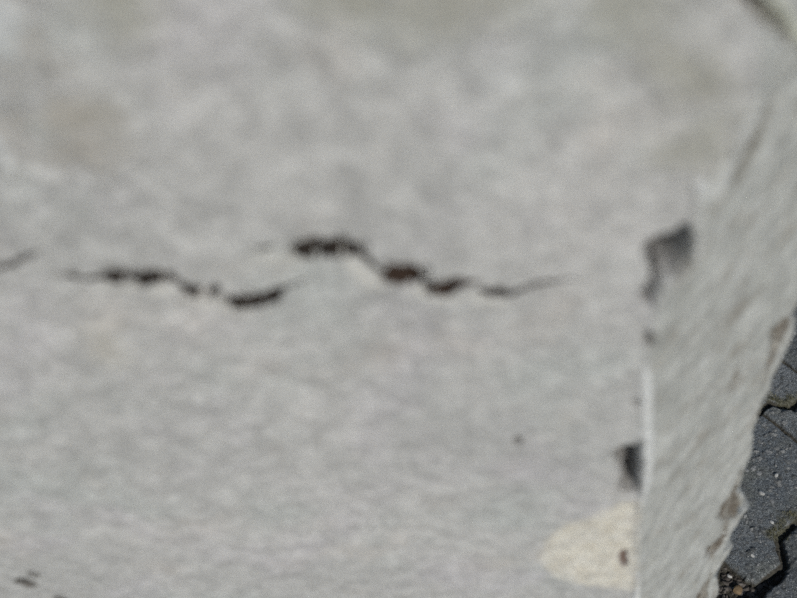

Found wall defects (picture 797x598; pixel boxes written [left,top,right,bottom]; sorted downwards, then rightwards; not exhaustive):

crack [0,252,37,274]
crack [54,232,587,317]
spalling [635,221,697,307]
peeling [640,330,658,349]
peeling [535,442,644,593]